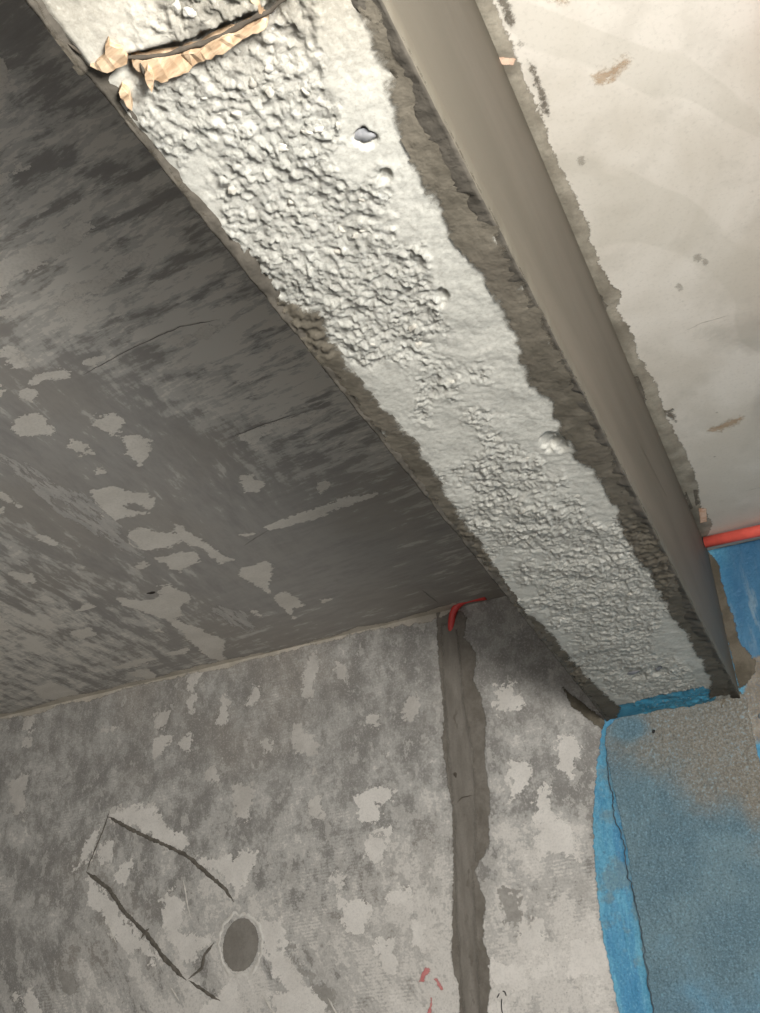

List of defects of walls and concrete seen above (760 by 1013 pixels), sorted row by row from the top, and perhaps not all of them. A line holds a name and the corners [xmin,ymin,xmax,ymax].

crack [128,0,286,78]
rust [594,61,628,83]
crack [87,810,234,1001]